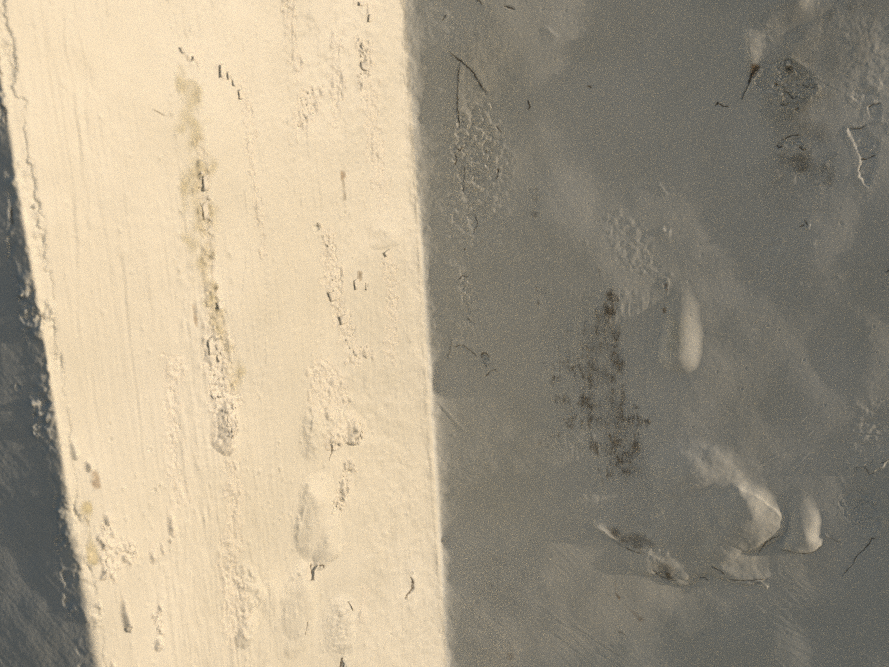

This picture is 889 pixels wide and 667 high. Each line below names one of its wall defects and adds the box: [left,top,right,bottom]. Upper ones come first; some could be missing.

spalling [750,53,824,114]
mould [552,333,649,474]